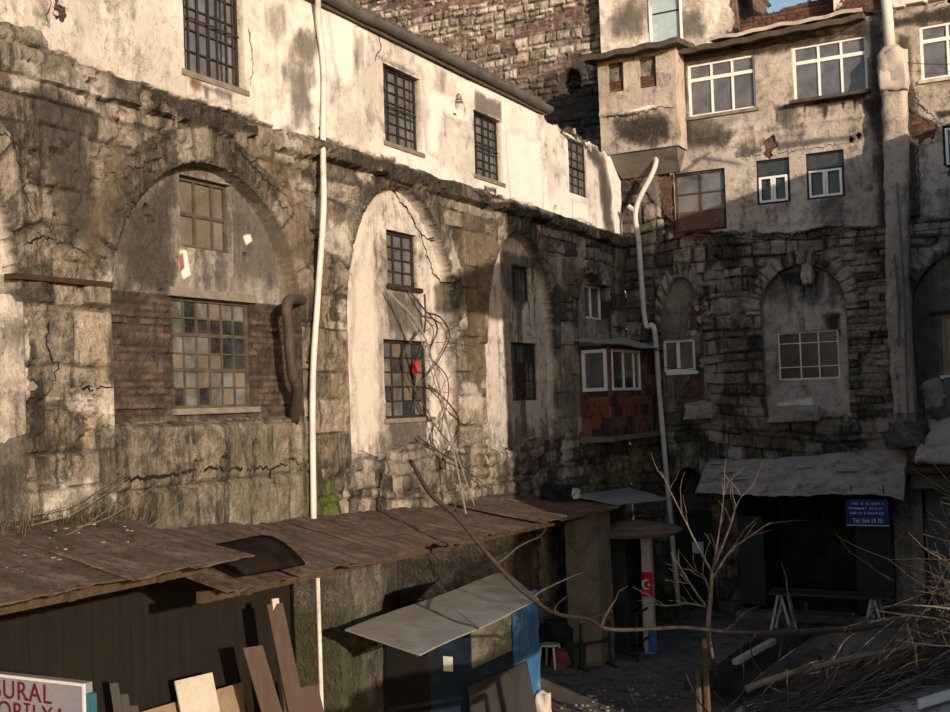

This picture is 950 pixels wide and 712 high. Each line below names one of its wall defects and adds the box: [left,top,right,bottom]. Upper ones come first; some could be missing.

spalling [834,0,896,19]
water stain [285,28,318,127]
water stain [529,52,618,236]
water stain [614,113,670,146]
spalling [760,134,778,159]
spalling [909,113,938,145]
peeling [0,294,38,443]